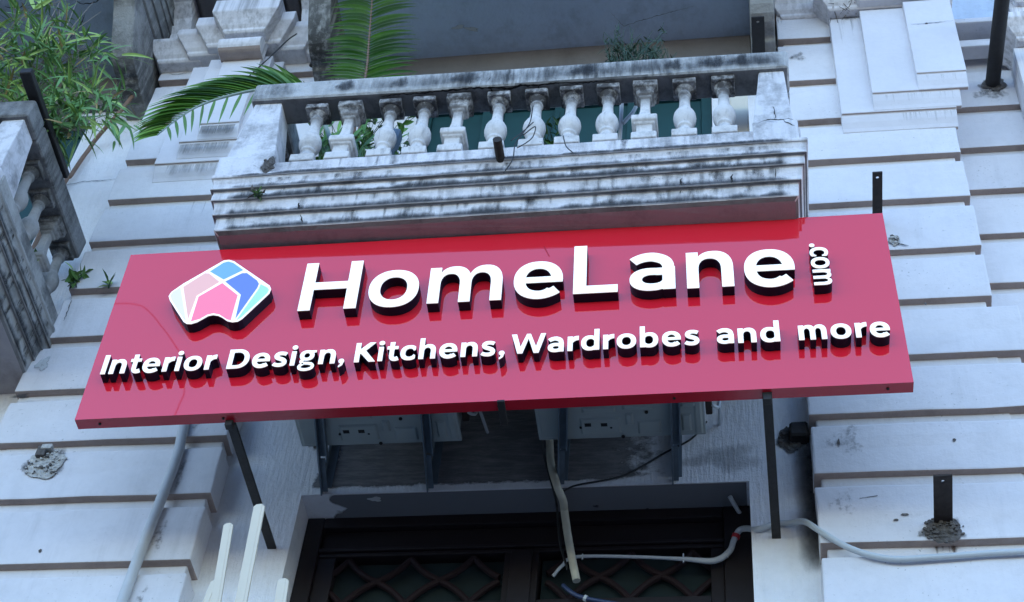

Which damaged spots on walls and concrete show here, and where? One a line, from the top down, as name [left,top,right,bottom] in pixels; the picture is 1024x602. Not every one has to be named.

flaking render [22,444,67,479]
flaking render [919,518,965,543]